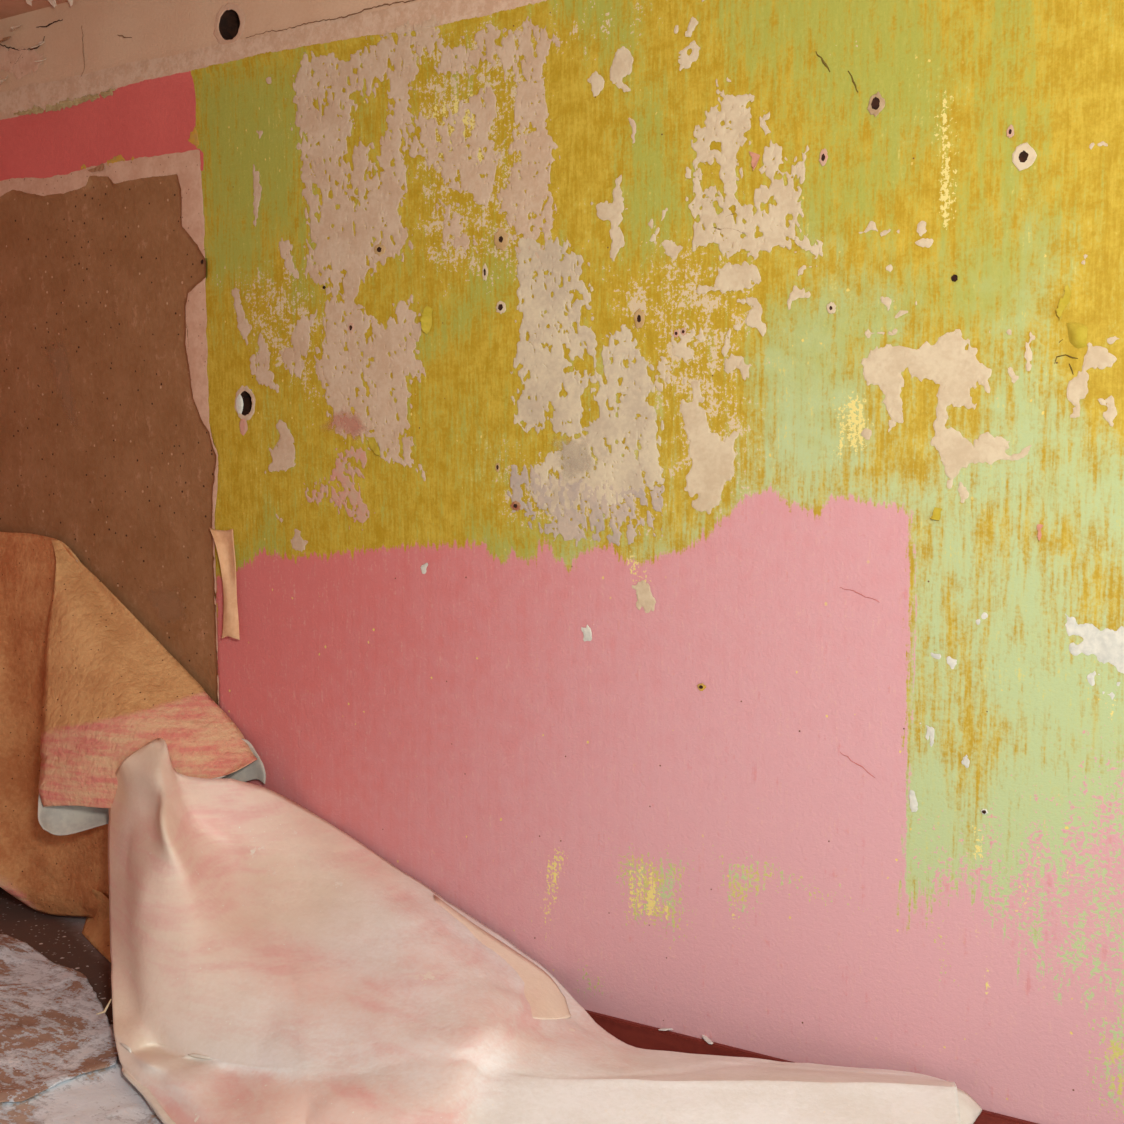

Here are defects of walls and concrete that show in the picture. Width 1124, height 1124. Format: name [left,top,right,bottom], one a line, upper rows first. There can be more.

peeling [14,88,115,116]
spalling [213,3,245,44]
peeling [232,15,739,547]
peeling [640,77,828,380]
spalling [0,127,219,706]
peeling [861,296,1035,503]
peeling [291,529,308,552]
peeling [1065,614,1124,700]